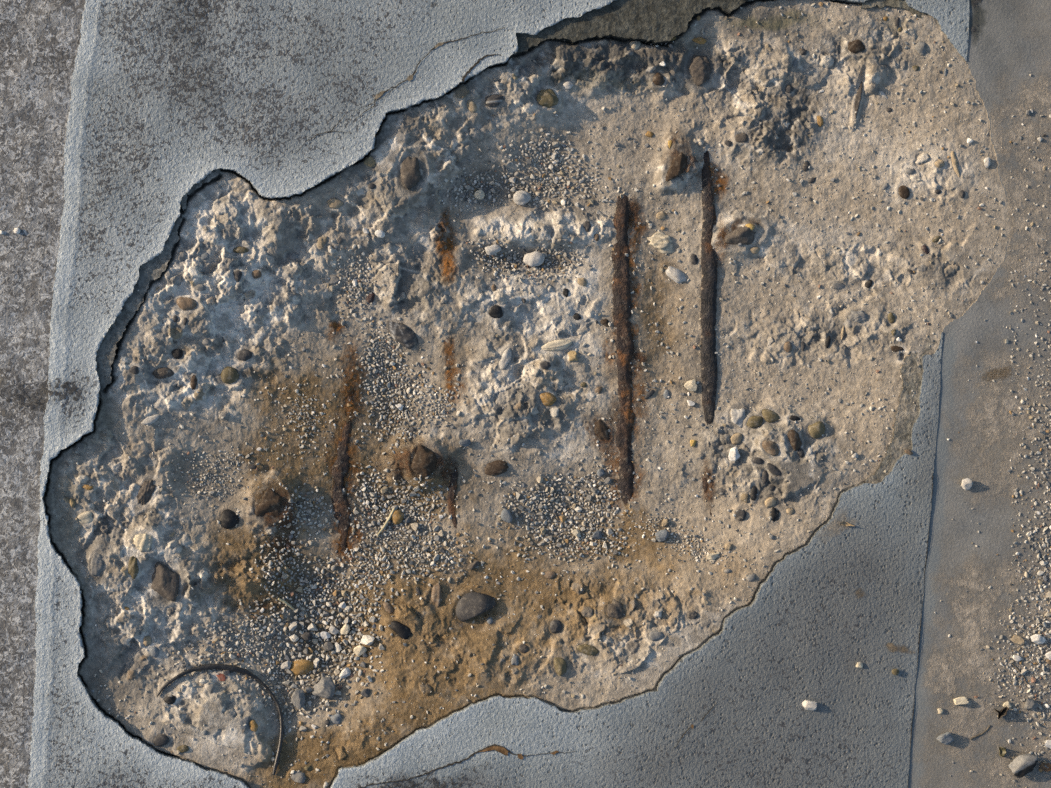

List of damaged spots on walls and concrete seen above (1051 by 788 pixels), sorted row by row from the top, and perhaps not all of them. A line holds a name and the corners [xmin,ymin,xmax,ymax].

spalling [516,0,748,54]
crack [296,27,504,153]
spalling [180,169,221,211]
rust [436,212,455,280]
spalling [96,217,182,391]
spalling [700,151,718,424]
spalling [611,195,635,506]
spalling [137,480,156,505]
rust [214,349,373,618]
rust [381,440,455,511]
spalling [151,562,179,602]
crack [360,744,576,788]